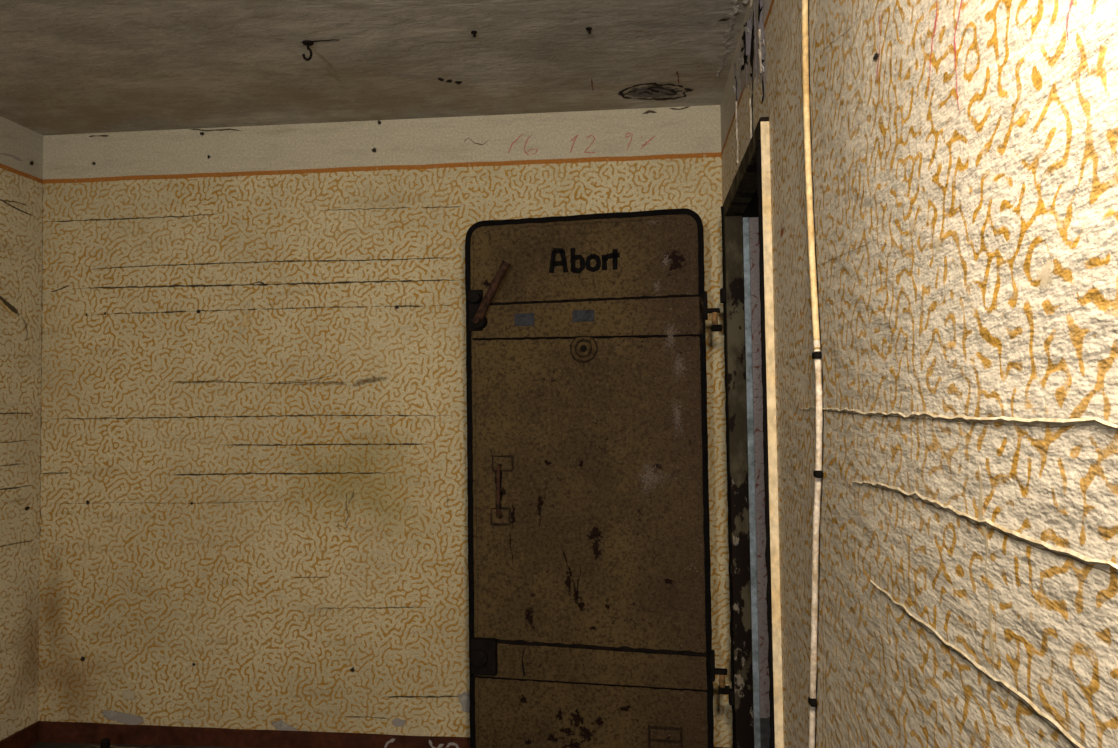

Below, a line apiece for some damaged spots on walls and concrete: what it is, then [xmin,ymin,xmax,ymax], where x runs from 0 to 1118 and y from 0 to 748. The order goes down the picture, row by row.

crack [802,406,1118,440]
crack [855,480,1118,575]
crack [870,580,1085,748]
corrosion [525,709,604,748]